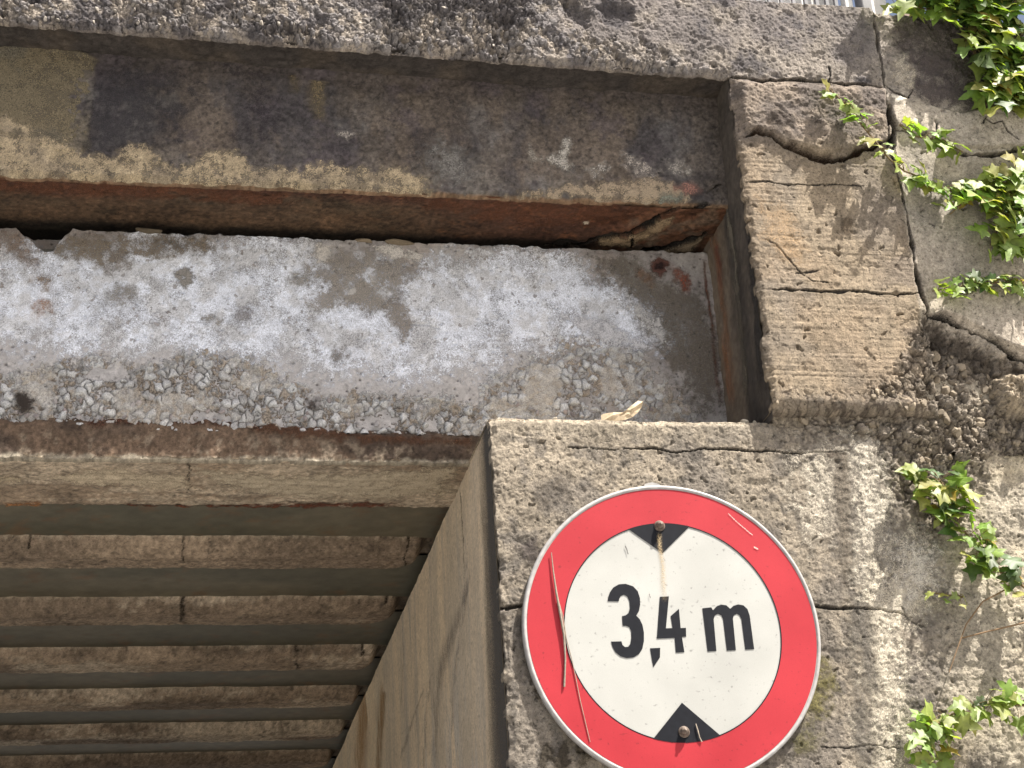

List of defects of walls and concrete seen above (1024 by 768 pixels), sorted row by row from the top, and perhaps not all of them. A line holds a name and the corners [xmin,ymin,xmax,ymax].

leakage [83,68,197,160]
leakage [408,96,481,187]
leakage [528,138,570,169]
crack [728,67,911,187]
crack [935,116,1024,158]
rust [0,177,284,205]
rust [406,196,636,227]
crack [547,184,721,252]
rust [638,257,691,291]
leakage [0,231,726,419]
rust [251,423,471,445]
crack [570,447,848,455]